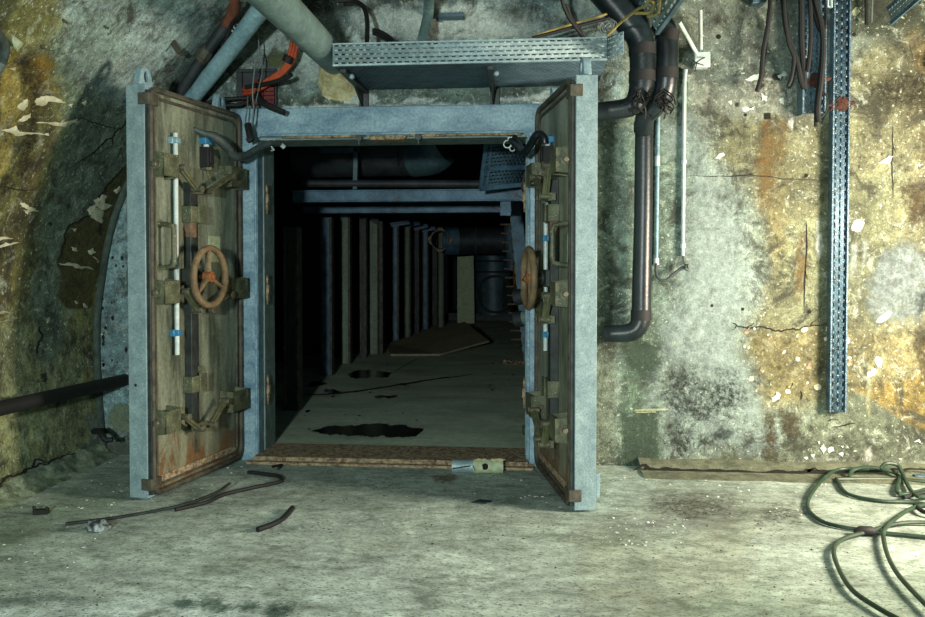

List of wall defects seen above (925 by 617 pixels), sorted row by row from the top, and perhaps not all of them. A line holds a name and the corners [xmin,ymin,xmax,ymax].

crack [70,117,126,168]
crack [687,171,822,181]
spalling [57,167,127,346]
crack [731,221,827,332]
crack [0,448,85,487]